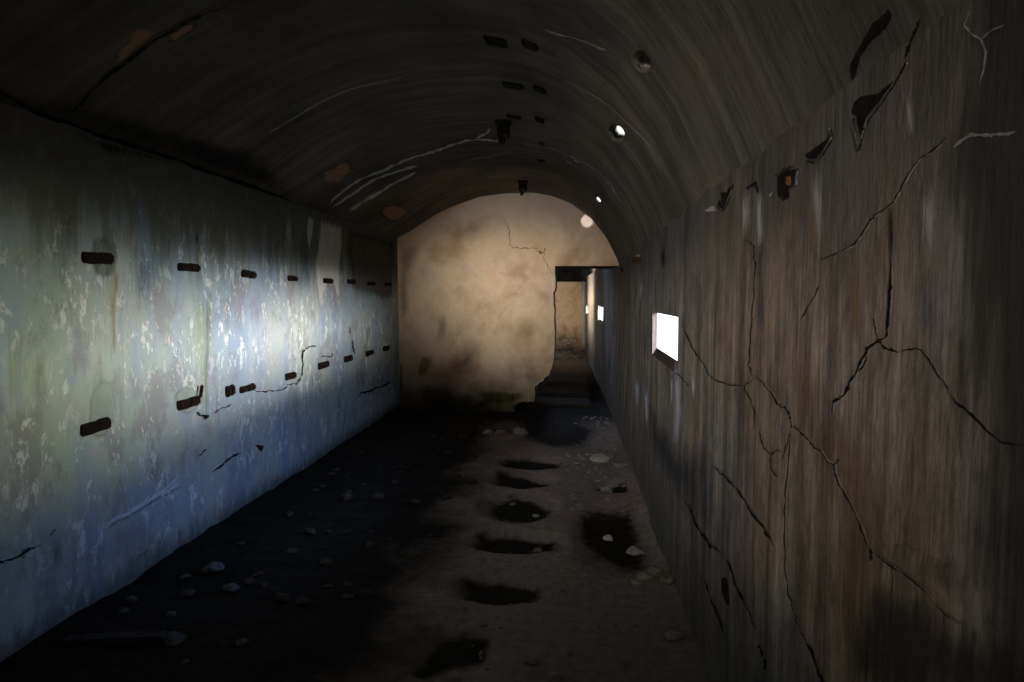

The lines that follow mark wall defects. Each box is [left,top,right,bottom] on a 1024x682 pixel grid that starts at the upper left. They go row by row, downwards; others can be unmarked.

spalling [850,9,892,79]
spalling [851,62,908,151]
spalling [705,128,833,212]
crack [818,131,952,261]
crack [504,218,552,273]
crack [197,404,231,420]
crack [253,327,355,393]
crack [357,382,392,397]
crack [831,255,1020,446]
crack [199,449,240,472]
crack [674,240,966,682]
crack [0,530,55,564]